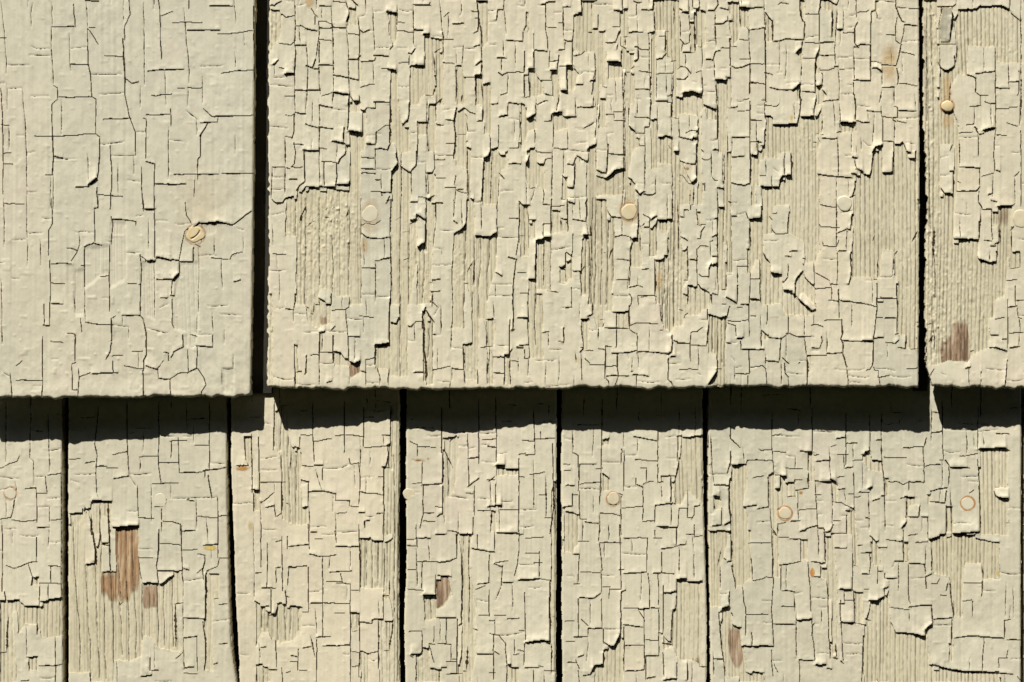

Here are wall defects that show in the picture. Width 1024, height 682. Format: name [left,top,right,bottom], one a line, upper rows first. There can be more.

peeling [268,9,281,52]
peeling [285,0,772,388]
peeling [748,0,838,316]
peeling [851,0,1021,365]
crack [0,0,255,682]
peeling [0,501,184,682]
peeling [351,406,400,682]
peeling [416,533,477,682]
peeling [550,479,579,673]
peeling [663,434,765,682]
peeling [807,453,858,657]
peeling [928,449,1009,617]